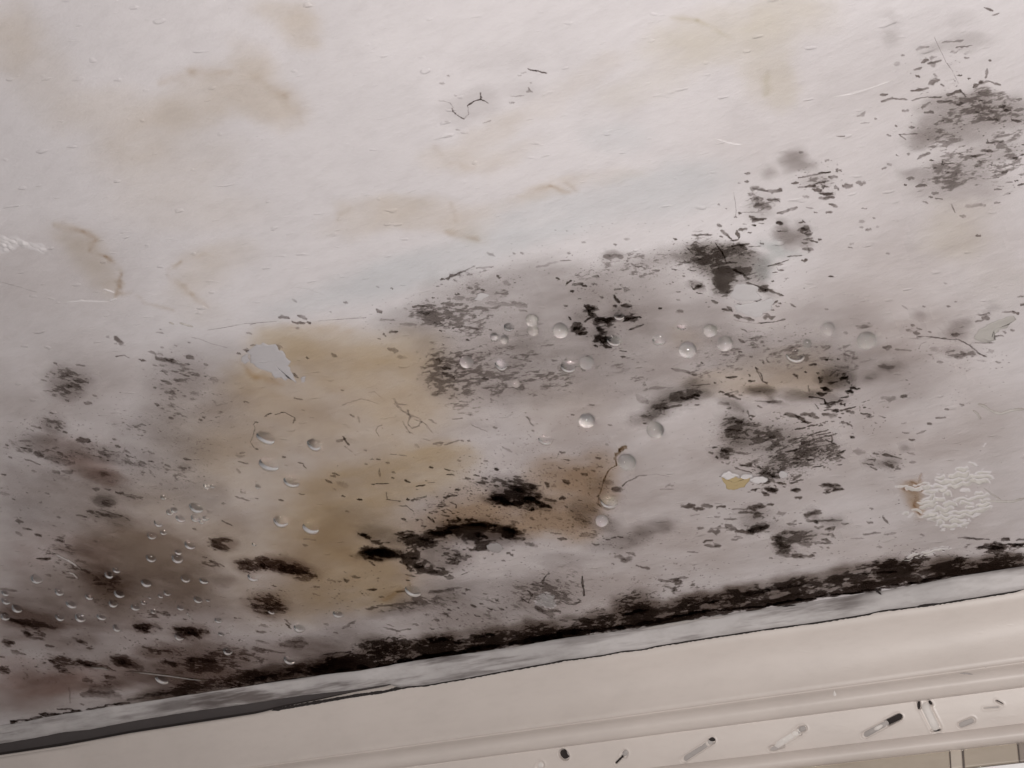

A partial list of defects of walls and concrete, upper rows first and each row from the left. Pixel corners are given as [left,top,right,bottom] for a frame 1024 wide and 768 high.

mould [688,212,782,318]
mould [566,295,642,358]
flaking render [241,342,306,383]
mould [785,371,868,468]
spalling [721,471,768,490]
mould [749,472,802,511]
mould [358,468,570,581]
mould [735,527,814,558]
mould [133,624,153,634]
leakage [151,538,1024,696]
mould [52,656,134,679]
leakage [10,702,130,724]